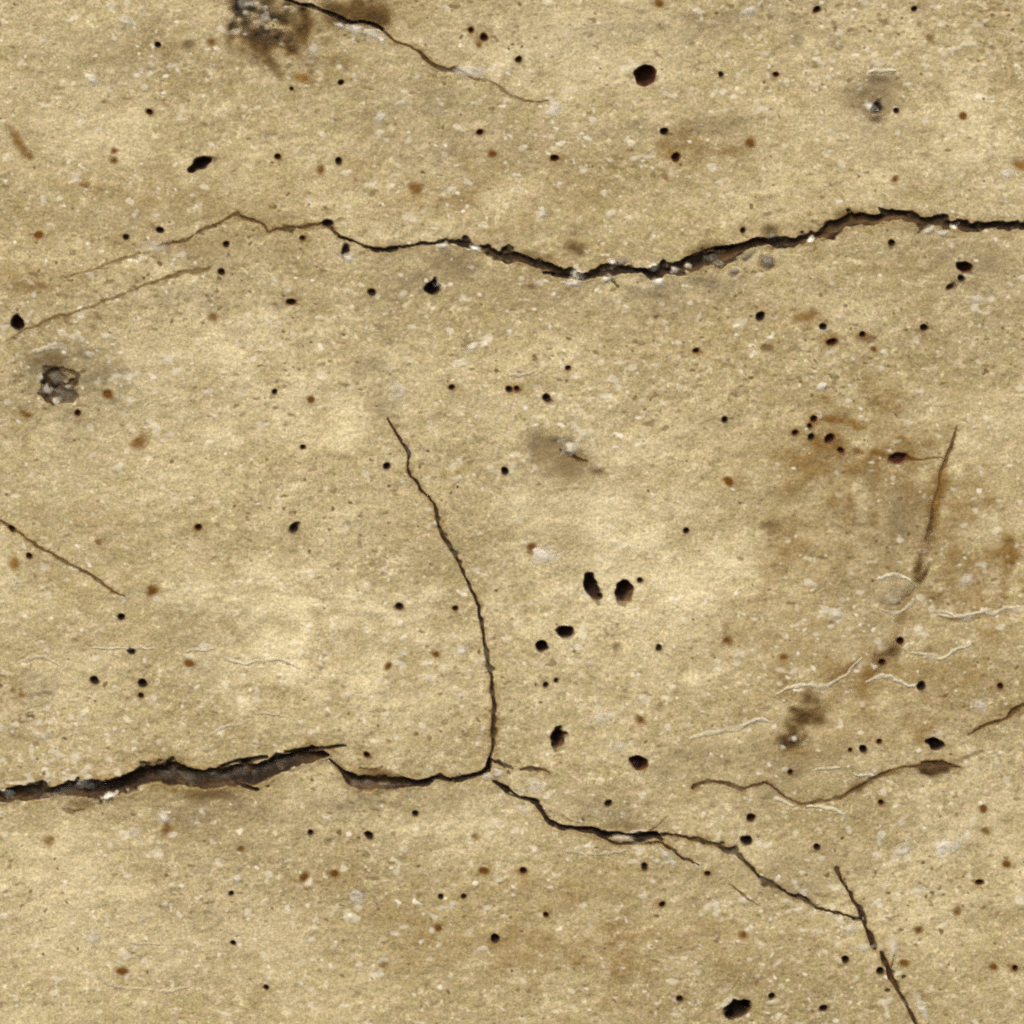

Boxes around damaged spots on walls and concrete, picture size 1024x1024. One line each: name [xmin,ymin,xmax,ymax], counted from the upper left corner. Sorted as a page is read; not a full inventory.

crack [285,0,549,103]
crack [65,256,128,278]
crack [159,209,1024,287]
crack [0,417,926,1024]